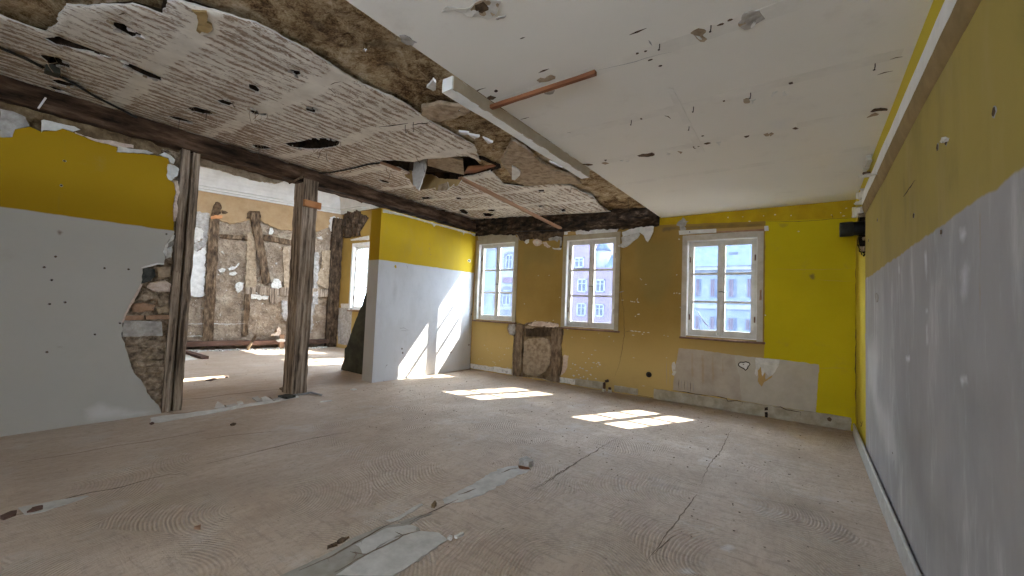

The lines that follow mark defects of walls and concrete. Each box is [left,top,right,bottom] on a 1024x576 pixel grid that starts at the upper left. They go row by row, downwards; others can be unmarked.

flaking render [442,0,506,20]
spalling [45,29,110,57]
spalling [114,22,141,36]
spalling [125,64,161,80]
spalling [286,138,339,149]
flaking render [0,109,180,221]
flaking render [200,159,283,184]
spalling [381,156,501,179]
flaking render [373,205,654,250]
flaking render [118,233,175,410]
flaking render [338,304,353,345]
flaking render [482,320,601,383]